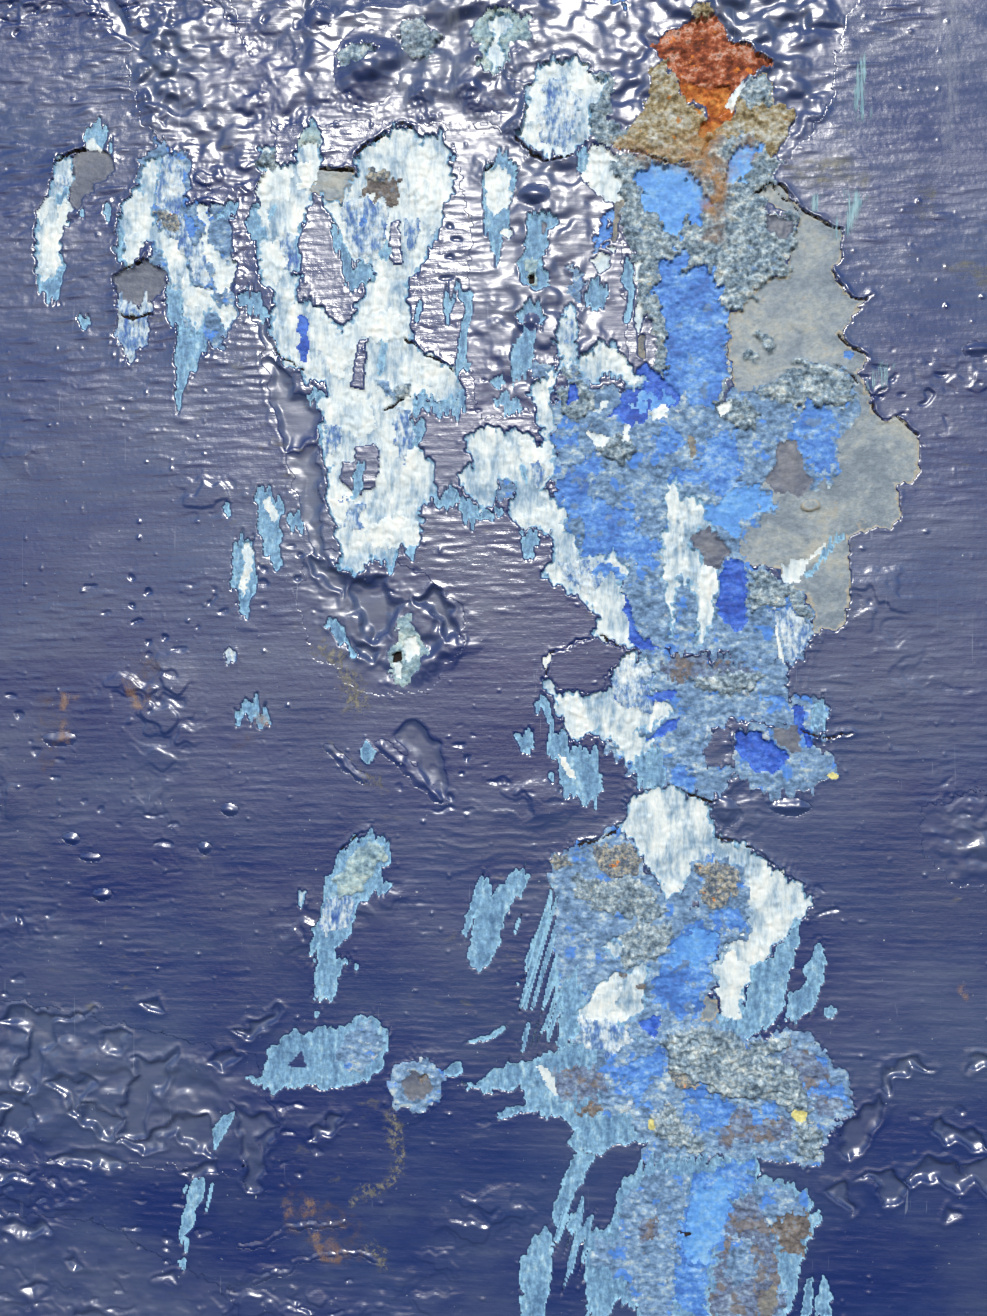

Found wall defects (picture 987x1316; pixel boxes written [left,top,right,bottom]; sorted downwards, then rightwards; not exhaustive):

peeling [470,5,532,75]
rust [610,2,796,204]
peeling [33,117,114,305]
peeling [77,314,91,330]
peeling [103,55,927,1316]
peeling [0,1006,280,1281]
peeling [862,1118,987,1205]
peeling [945,1209,961,1222]